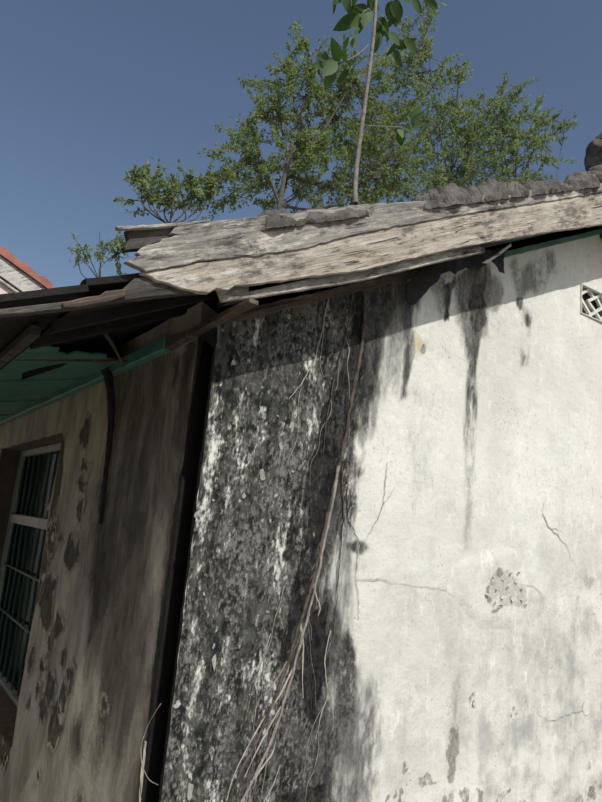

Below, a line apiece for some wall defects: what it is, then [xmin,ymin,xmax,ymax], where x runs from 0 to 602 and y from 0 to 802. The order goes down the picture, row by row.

water stain [431,265,503,422]
water stain [513,255,554,326]
peeling [23,412,92,754]
water stain [161,280,420,802]
crack [336,462,457,616]
spalling [486,567,528,612]
water stain [446,727,459,783]
peeling [443,788,483,802]